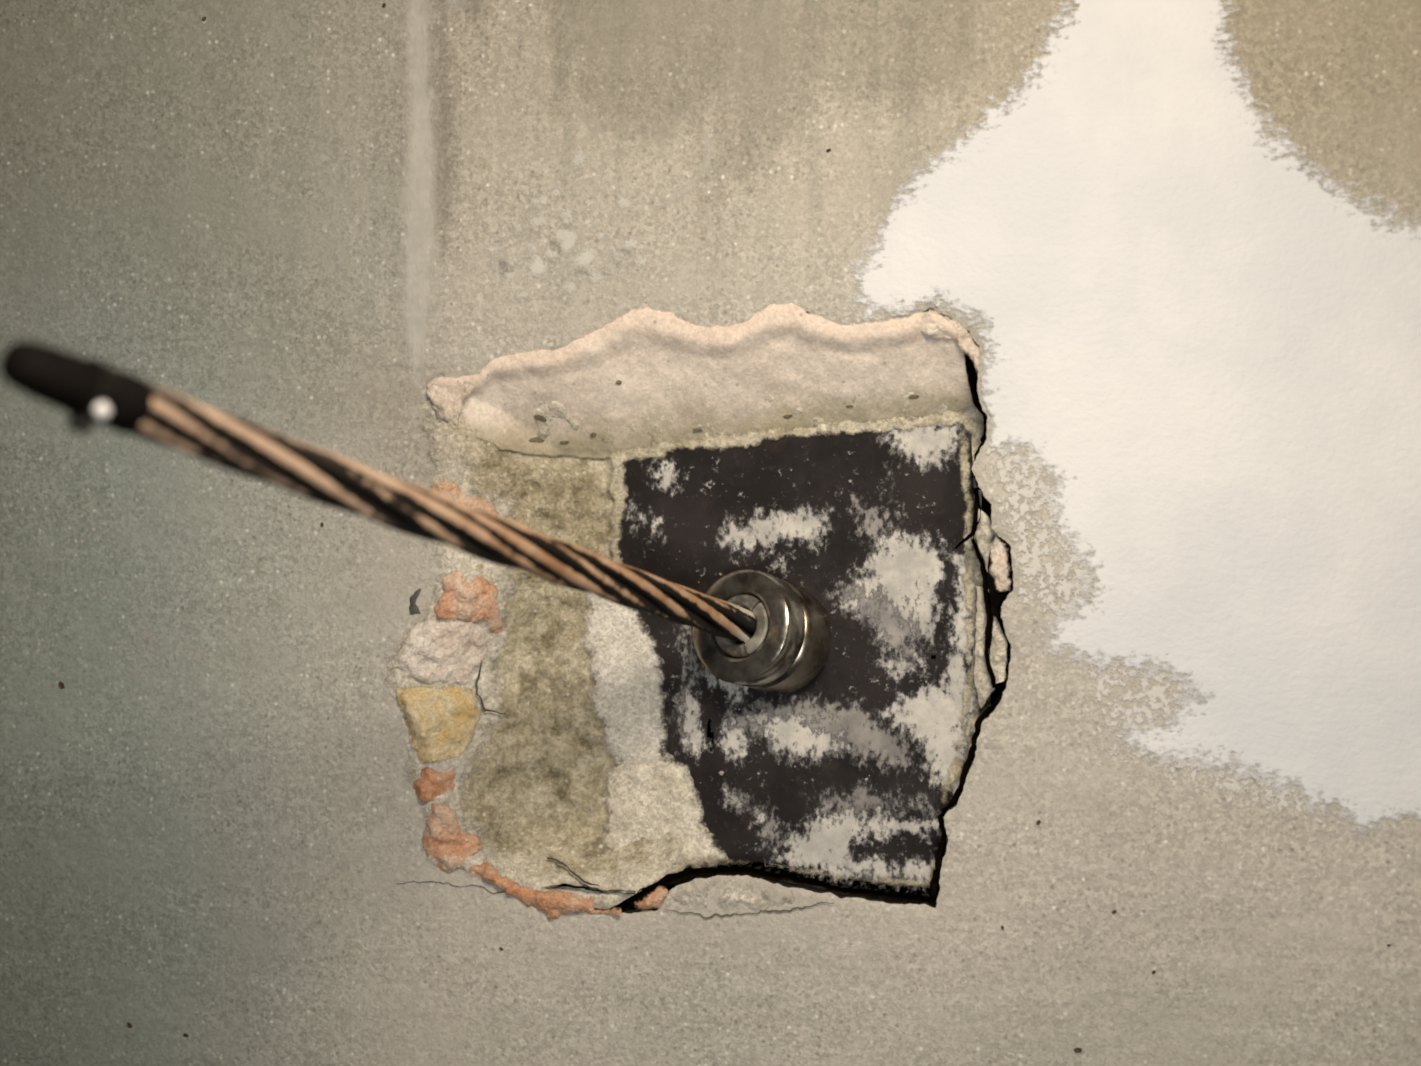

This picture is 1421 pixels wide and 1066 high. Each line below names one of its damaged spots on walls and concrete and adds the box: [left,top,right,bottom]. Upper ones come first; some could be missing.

crack [401,881,505,894]
spalling [385,541,810,921]
spalling [421,302,1011,802]
crack [543,352,1011,919]
spalling [764,862,940,888]